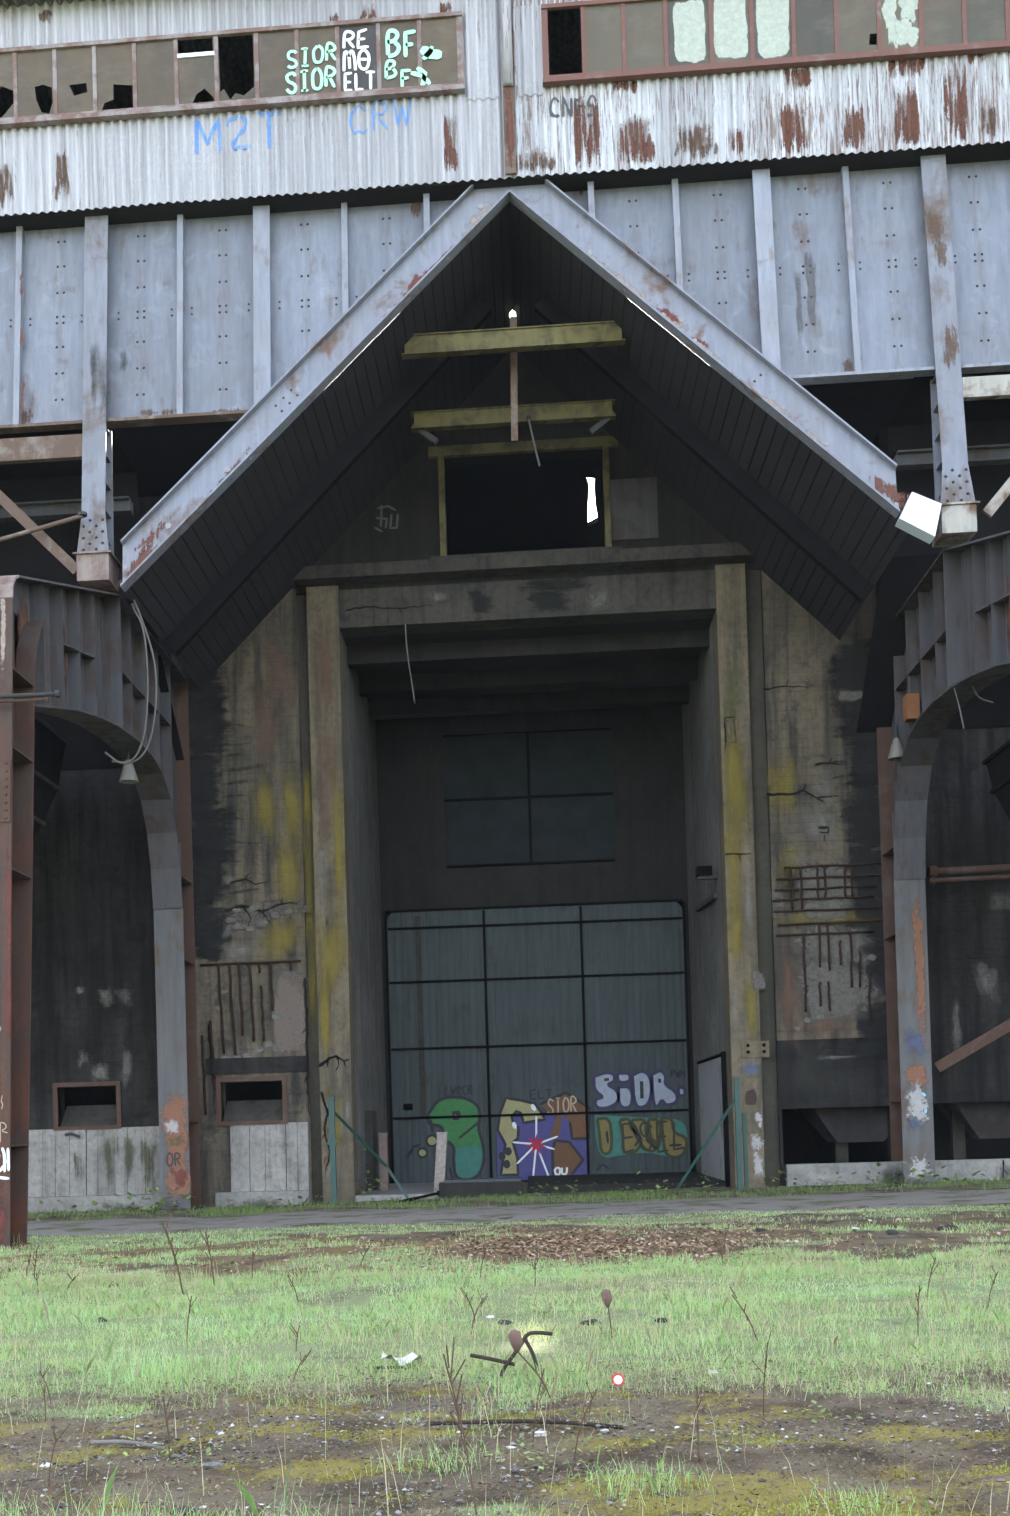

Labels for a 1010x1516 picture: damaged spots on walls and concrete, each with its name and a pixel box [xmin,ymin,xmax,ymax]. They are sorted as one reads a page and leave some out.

corrosion [785,67,812,88]
corrosion [888,58,925,144]
corrosion [943,53,997,139]
corrosion [444,115,458,170]
corrosion [504,86,556,171]
corrosion [573,91,601,168]
corrosion [620,114,655,164]
corrosion [674,126,743,157]
corrosion [781,105,808,152]
corrosion [842,105,865,149]
corrosion [0,165,13,207]
corrosion [55,152,69,201]